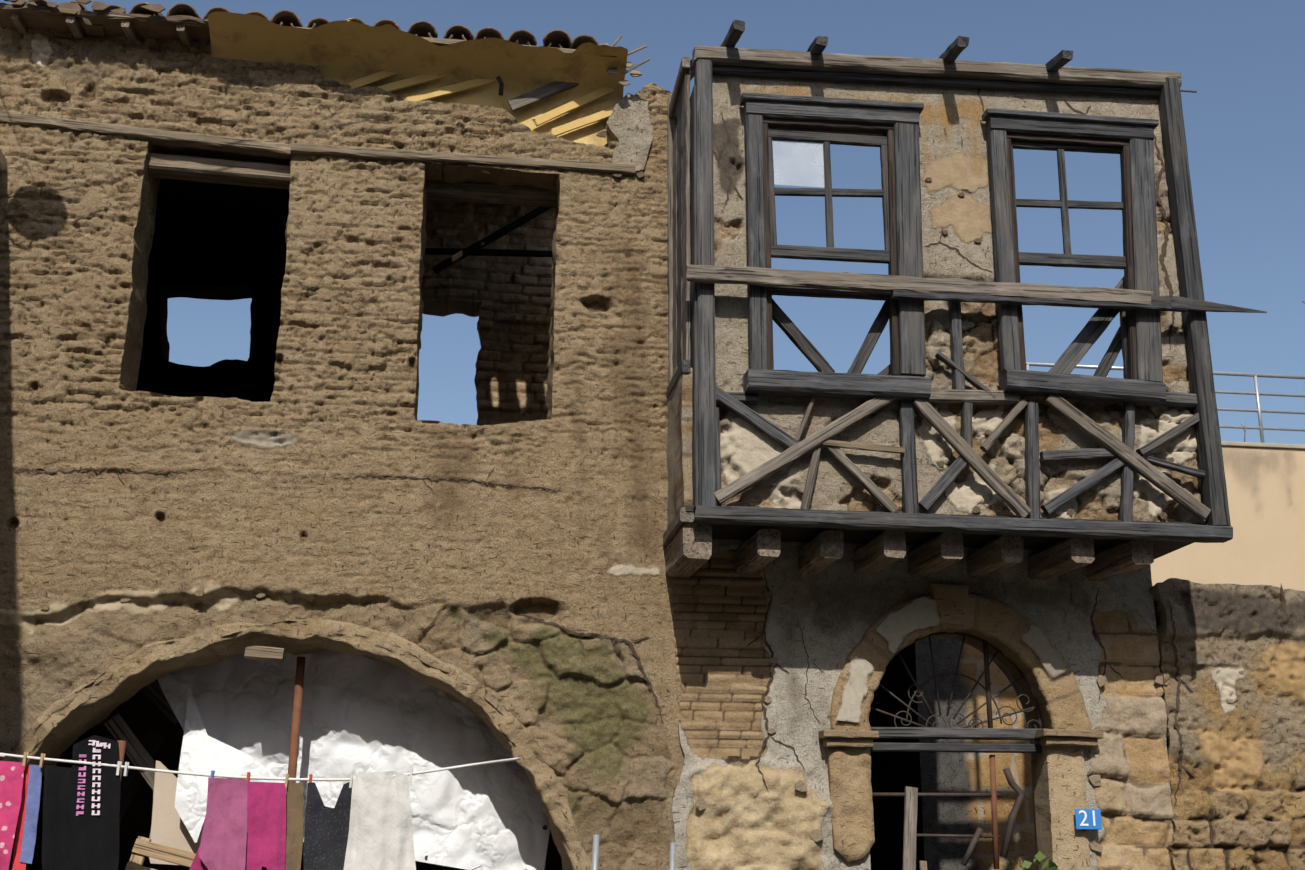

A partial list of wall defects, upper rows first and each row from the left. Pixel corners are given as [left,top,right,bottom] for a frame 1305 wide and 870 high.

crack [926,226,992,272]
spalling [607,549,778,760]
crack [747,568,824,790]
spalling [1211,666,1246,715]
spalling [1197,727,1263,802]